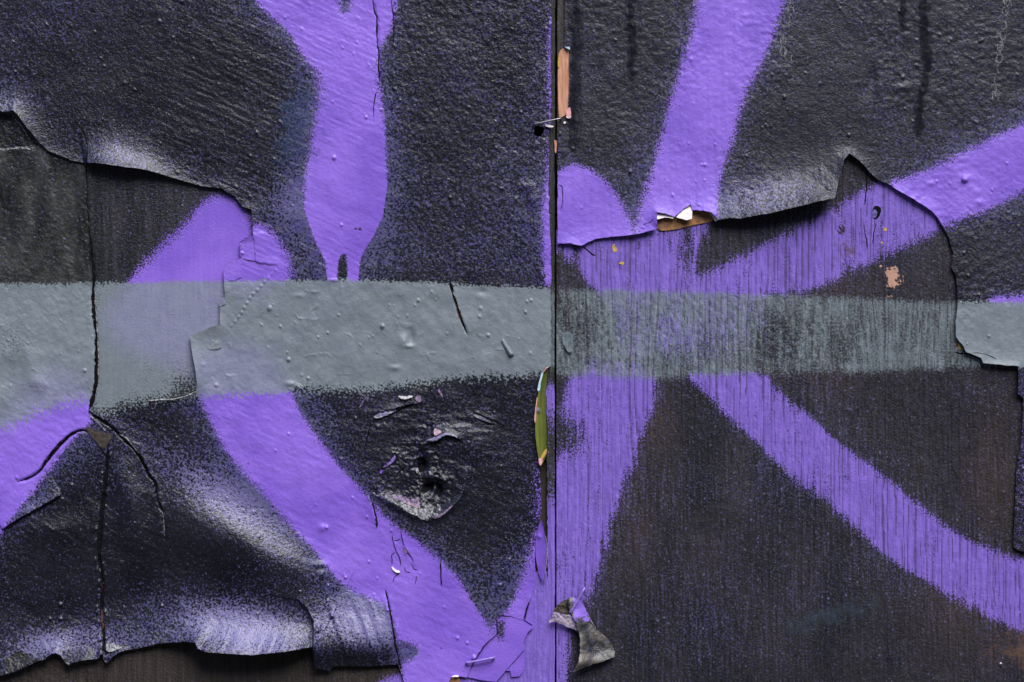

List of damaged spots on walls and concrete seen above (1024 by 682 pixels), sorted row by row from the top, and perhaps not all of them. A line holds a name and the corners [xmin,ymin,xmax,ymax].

peeling [0,110,255,414]
crack [449,280,467,333]
crack [18,121,165,654]
peeling [364,395,421,449]
peeling [422,424,462,444]
peeling [449,154,1024,682]
spalling [373,454,453,521]
crack [3,495,61,542]
peeling [0,641,404,682]